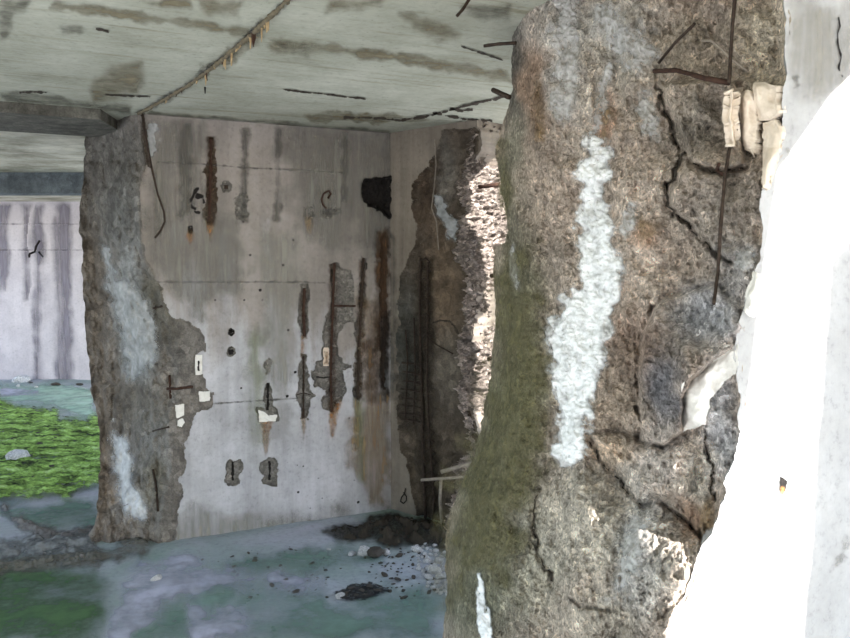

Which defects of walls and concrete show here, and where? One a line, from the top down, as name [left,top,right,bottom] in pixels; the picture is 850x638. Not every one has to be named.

water stain [54,4,151,22]
water stain [354,49,507,78]
water stain [54,204,72,379]
spalling [79,114,218,544]
spalling [295,256,367,437]
corrosion [351,230,391,505]
hole [361,175,392,219]
efflorescence [546,63,635,467]
spalling [396,0,798,638]
crack [660,89,743,254]
crack [589,442,641,505]
crack [704,432,714,495]